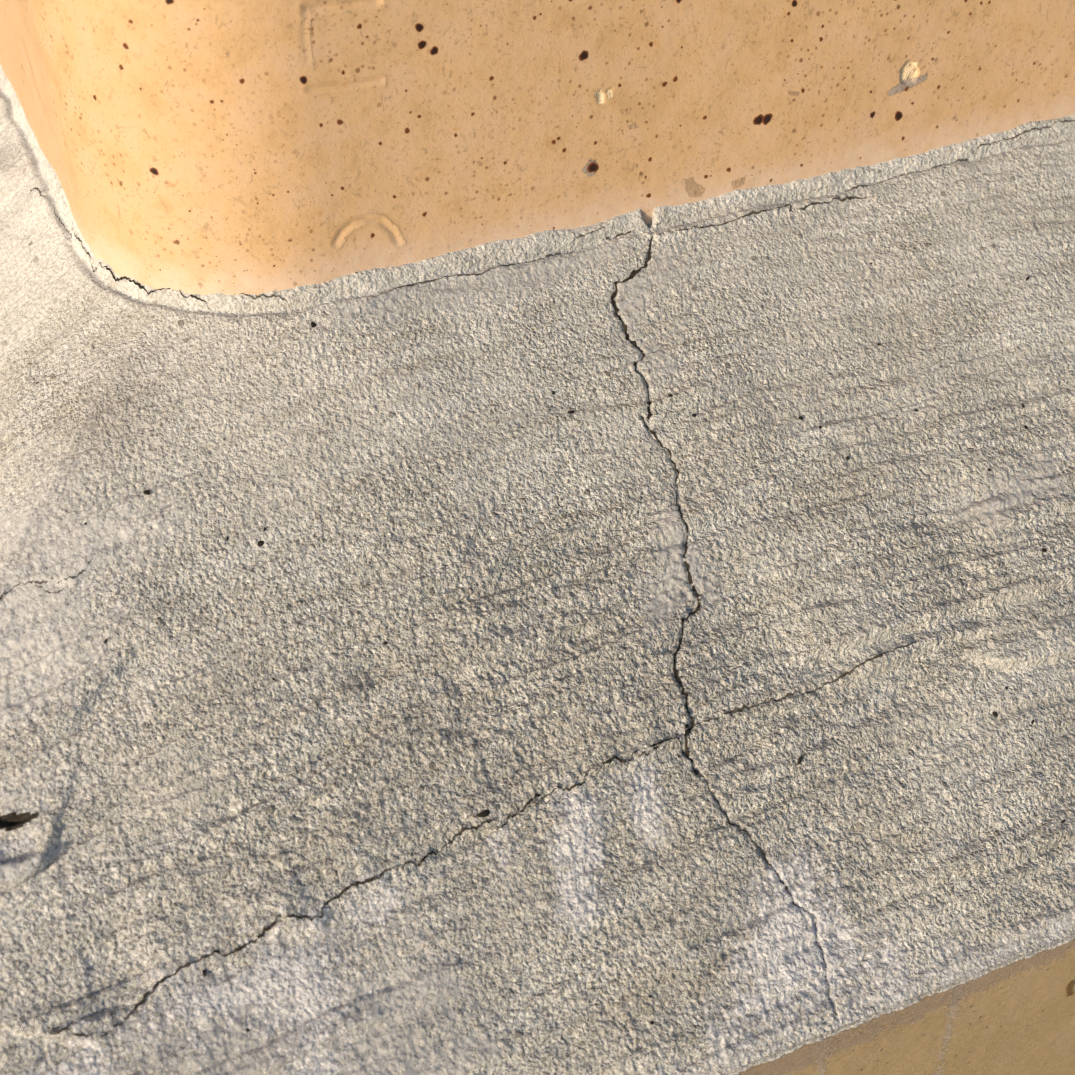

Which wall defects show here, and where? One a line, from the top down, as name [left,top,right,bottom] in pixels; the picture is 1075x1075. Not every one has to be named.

crack [674,120,1075,232]
crack [30,187,294,311]
crack [0,558,96,600]
crack [50,227,919,1038]